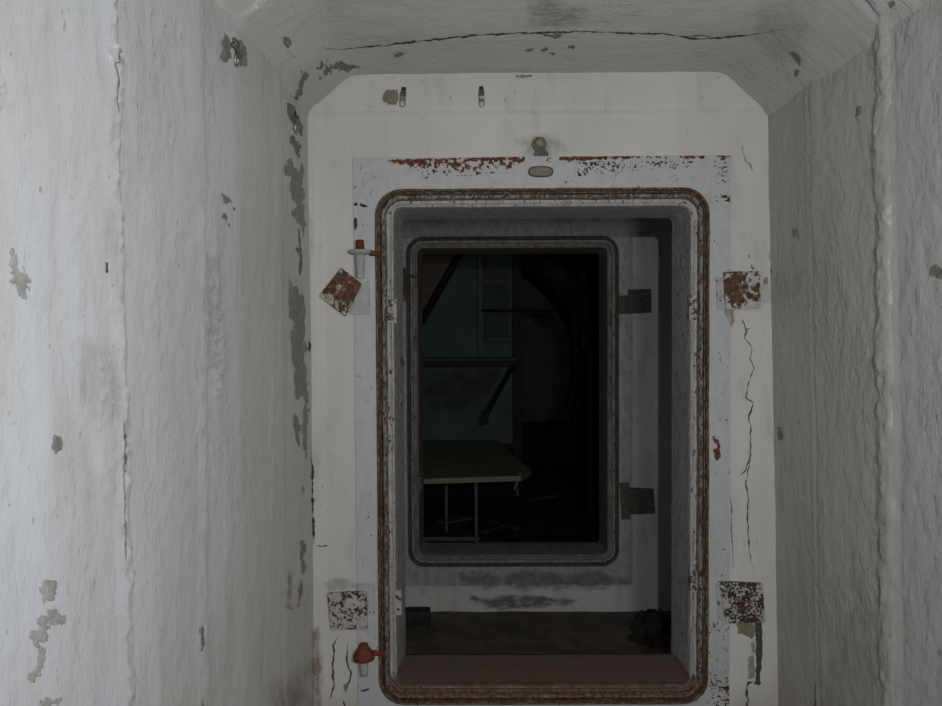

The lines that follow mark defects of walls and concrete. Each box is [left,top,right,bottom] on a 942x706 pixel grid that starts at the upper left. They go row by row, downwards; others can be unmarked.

peeling [220,34,248,66]
rust [388,157,525,179]
rust [559,155,730,183]
peeling [10,248,31,299]
peeling [284,60,359,458]
crack [730,318,755,566]
peeling [28,579,66,682]
peeling [40,697,62,706]
rust [706,652,729,706]